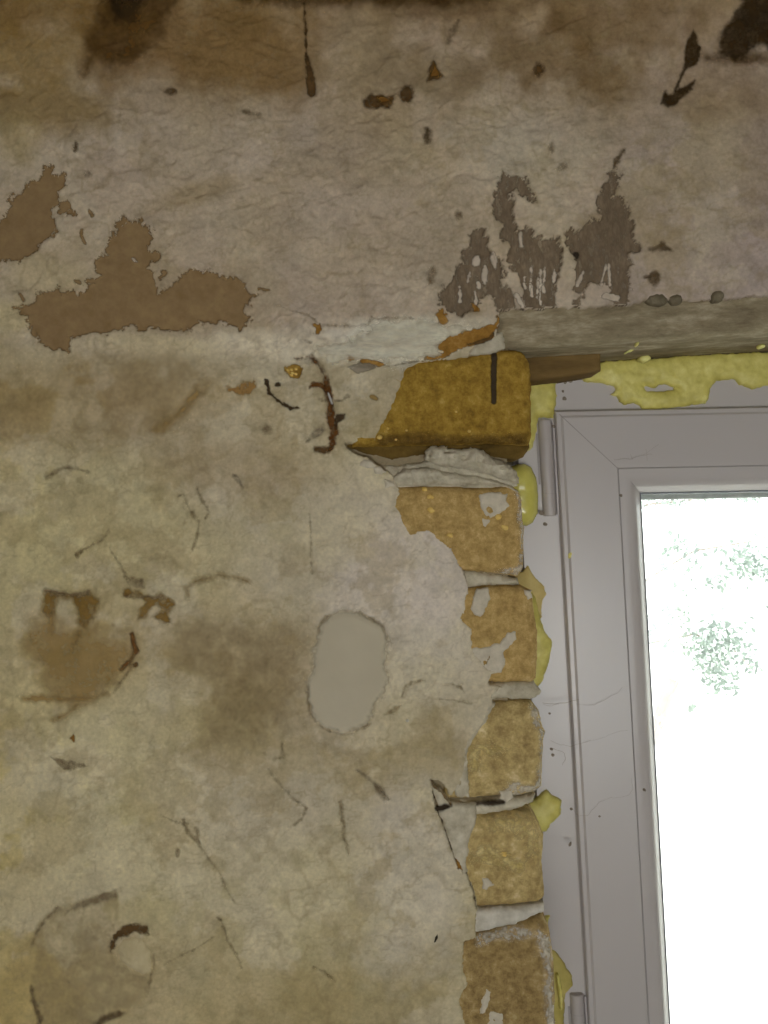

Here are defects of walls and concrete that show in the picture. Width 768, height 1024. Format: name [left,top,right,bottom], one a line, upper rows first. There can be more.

peeling [0,164,94,262]
peeling [12,216,270,354]
peeling [422,149,671,362]
spalling [347,355,385,374]
damp [23,624,131,709]
spalling [432,784,452,812]
crack [433,794,476,904]